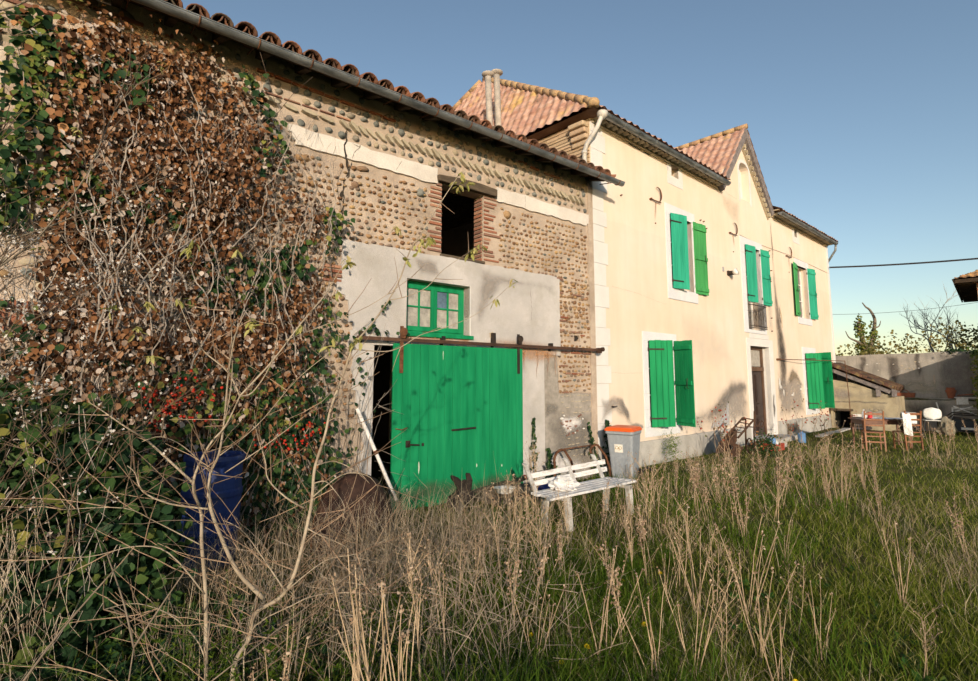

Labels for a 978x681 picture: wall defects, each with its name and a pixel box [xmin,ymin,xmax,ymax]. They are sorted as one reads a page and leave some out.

water stain [776,300,802,410]
water stain [889,358,898,380]
water stain [605,399,638,426]
water stain [708,384,746,428]